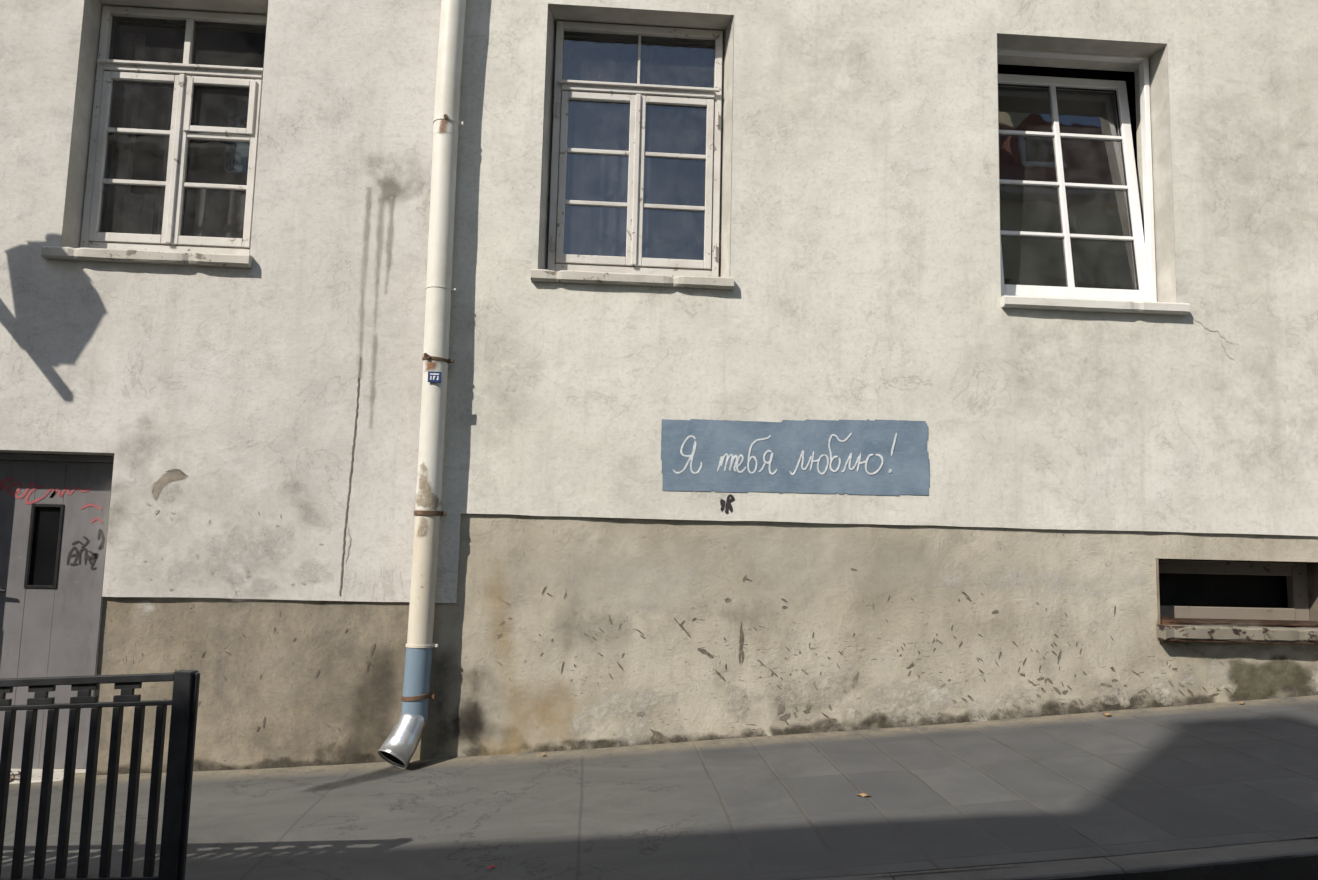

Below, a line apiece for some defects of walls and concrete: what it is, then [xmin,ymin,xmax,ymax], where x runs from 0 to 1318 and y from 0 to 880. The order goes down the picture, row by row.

leakage [364,180,396,281]
spalling [150,469,188,514]
peeling [416,464,439,536]
leakage [1230,666,1318,702]
leakage [193,660,1213,788]